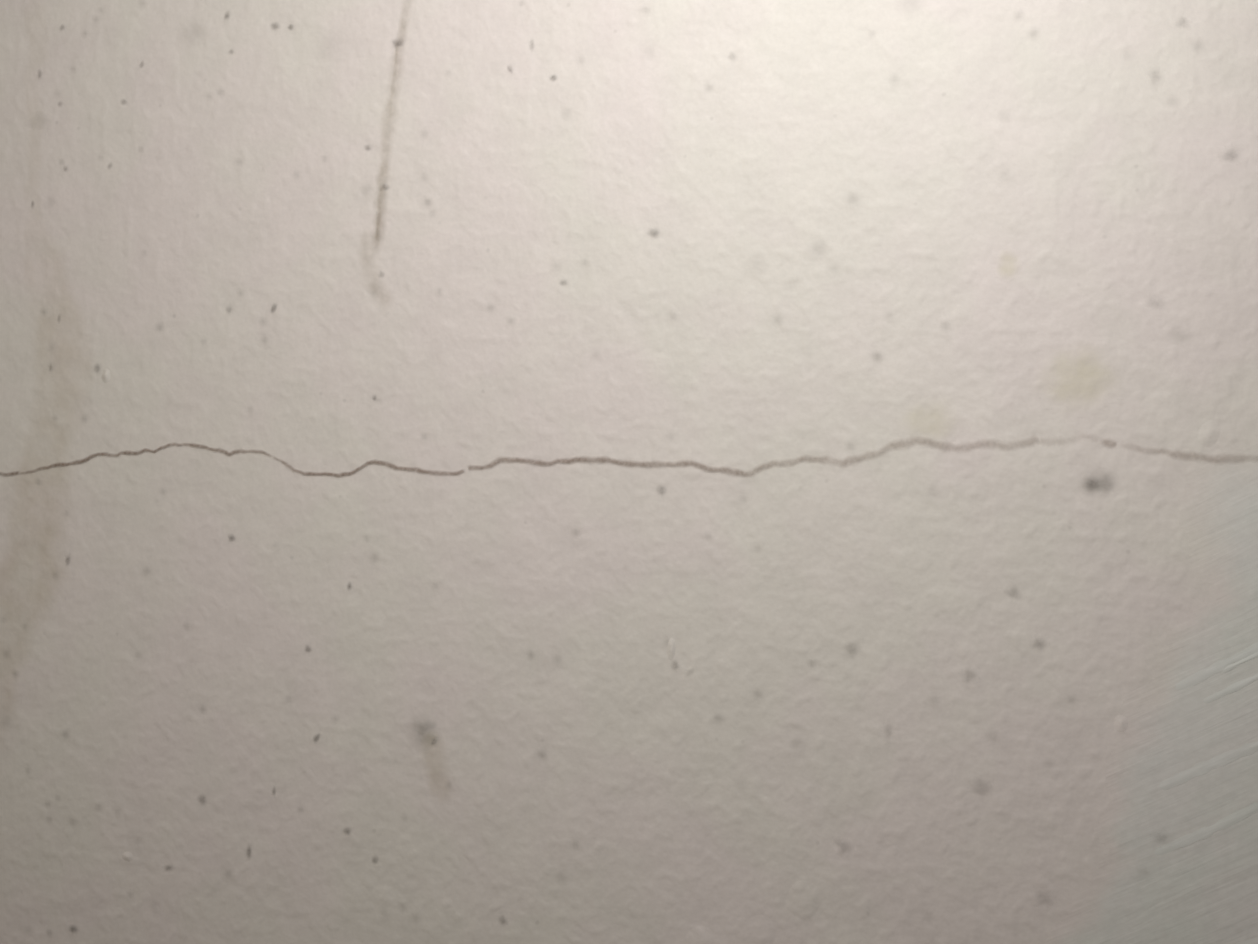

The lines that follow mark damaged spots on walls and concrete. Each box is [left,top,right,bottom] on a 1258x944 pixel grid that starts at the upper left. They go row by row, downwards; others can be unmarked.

crack [6,444,264,475]
crack [302,458,644,477]